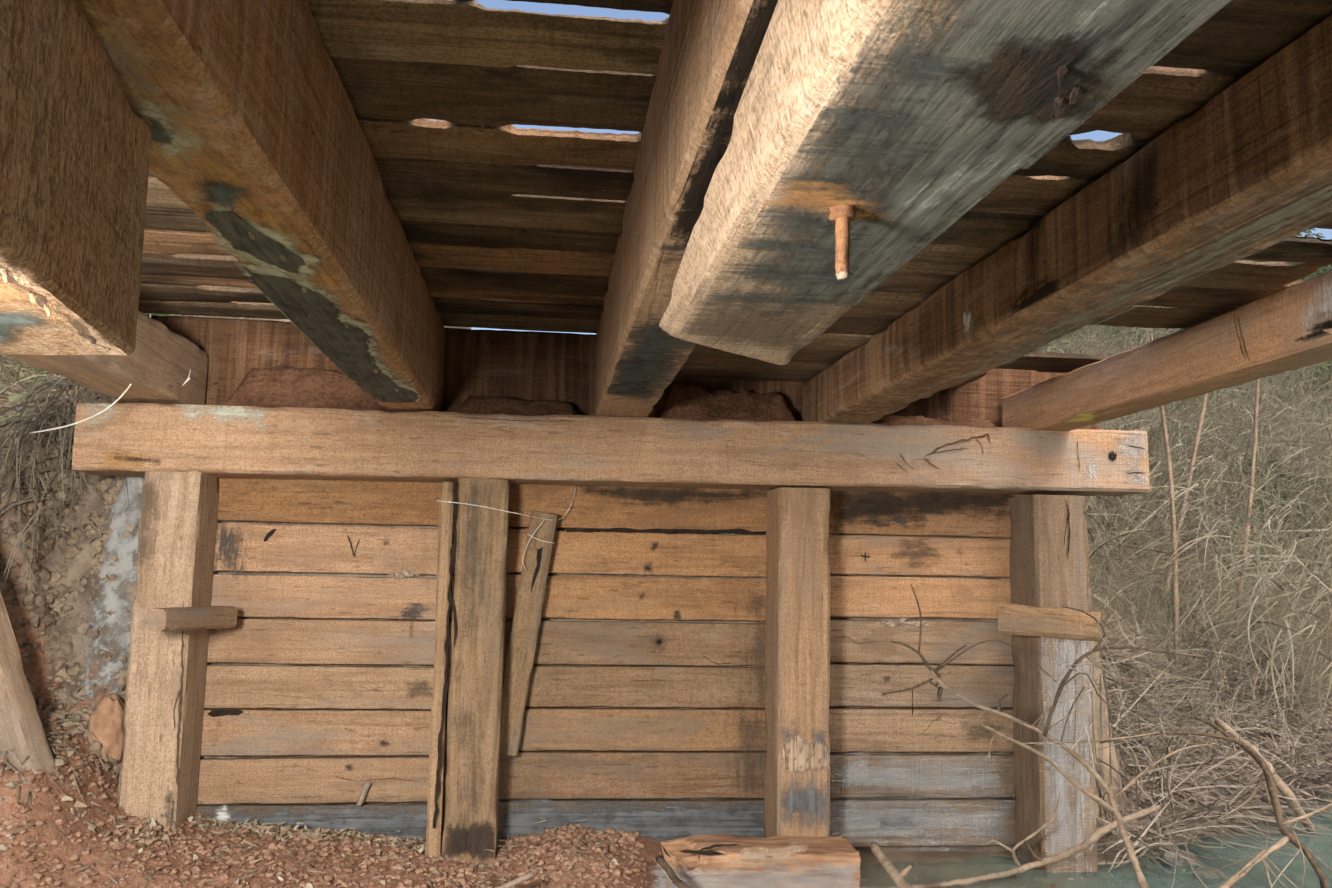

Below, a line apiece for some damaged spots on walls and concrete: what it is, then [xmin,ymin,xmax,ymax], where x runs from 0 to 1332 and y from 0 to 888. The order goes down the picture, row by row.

rust [760,181,873,217]
damp [702,0,1232,314]
damp [0,311,38,341]
damp [606,318,698,402]
crack [331,482,458,828]